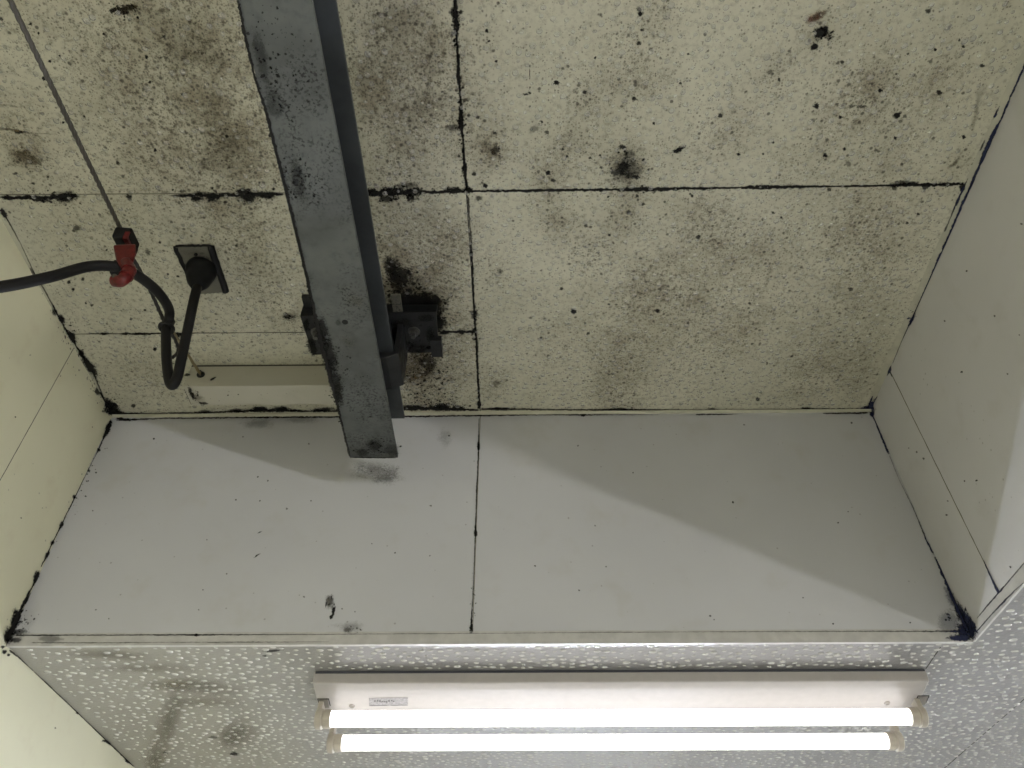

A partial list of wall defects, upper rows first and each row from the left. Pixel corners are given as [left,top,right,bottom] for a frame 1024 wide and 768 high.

leakage [0,0,402,767]
leakage [368,0,1024,642]